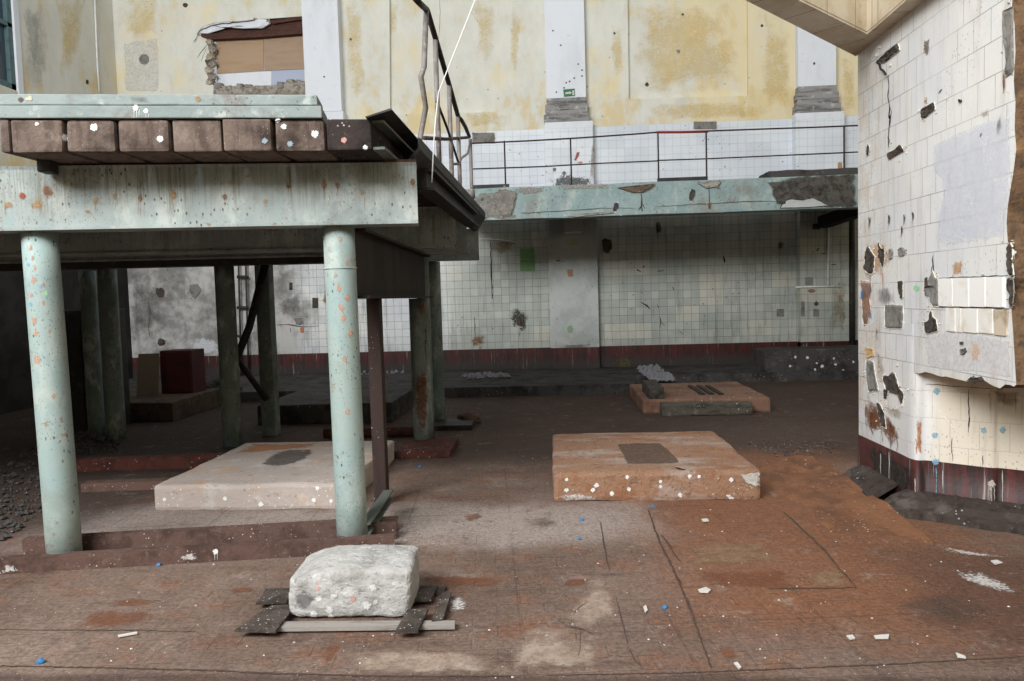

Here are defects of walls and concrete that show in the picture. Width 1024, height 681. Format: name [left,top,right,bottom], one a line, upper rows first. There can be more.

flaking render [197,18,271,85]
crack [885,80,893,148]
corrosion [4,187,52,213]
spalling [474,168,658,220]
peeling [776,197,830,208]
peeling [859,242,907,329]
peeling [921,270,941,334]
spalling [1006,240,1016,308]
corrosion [416,374,427,427]
peeling [862,348,909,431]